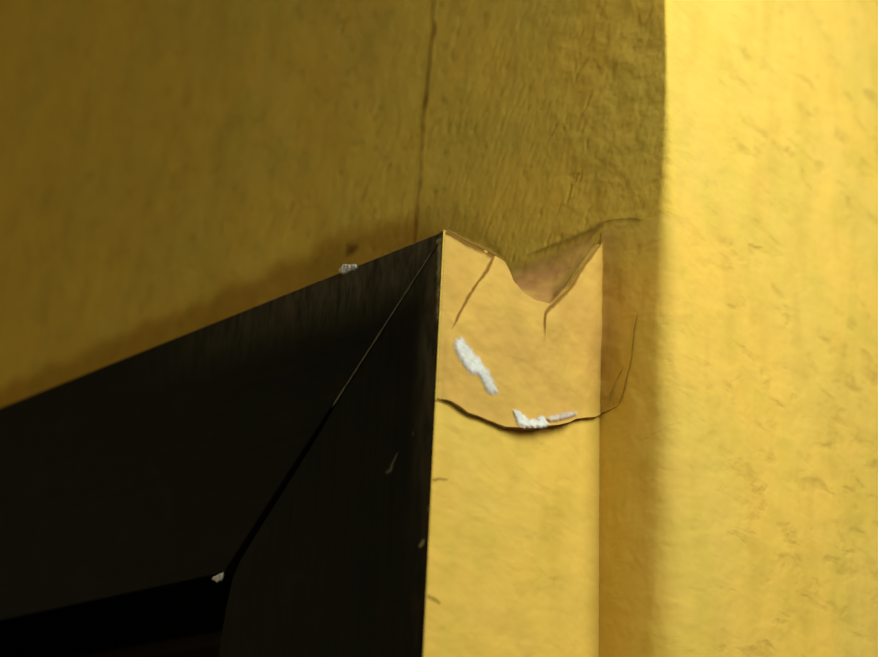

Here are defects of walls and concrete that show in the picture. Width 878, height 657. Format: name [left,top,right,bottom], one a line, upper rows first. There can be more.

crack [333,0,511,405]
flaking render [456,338,498,394]
flaking render [514,410,578,427]